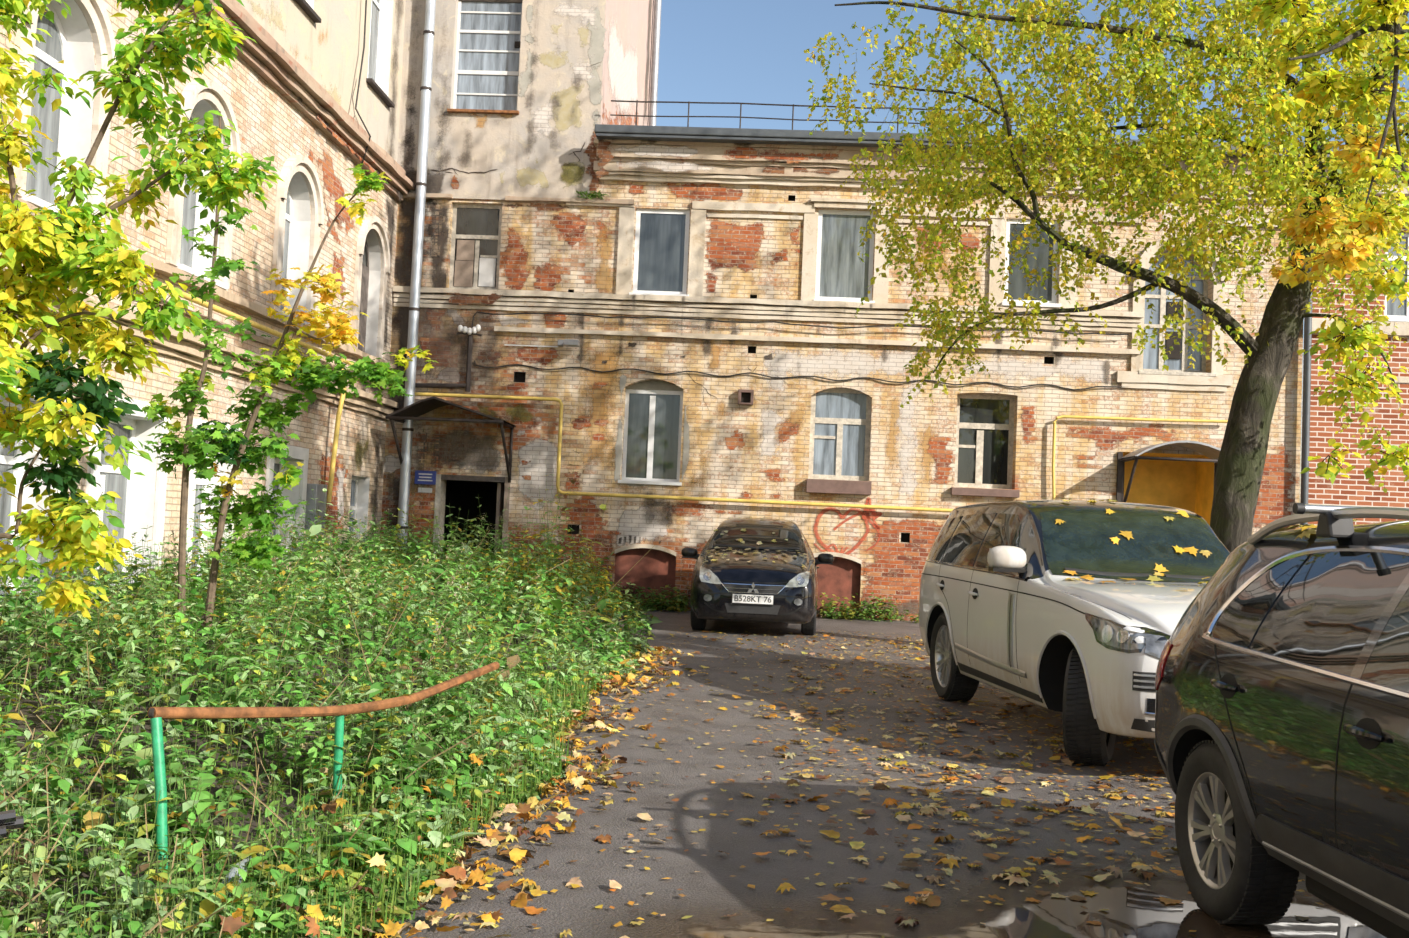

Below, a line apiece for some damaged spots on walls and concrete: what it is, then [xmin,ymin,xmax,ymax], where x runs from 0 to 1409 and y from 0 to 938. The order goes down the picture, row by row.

leakage [527,57,560,148]
peeling [550,84,743,201]
spalling [308,114,377,299]
peeling [507,161,607,247]
peeling [419,227,562,367]
peeling [705,218,804,293]
spalling [517,415,621,586]
peeling [926,436,953,484]
peeling [1021,406,1037,444]
peeling [1066,424,1178,468]
peeling [1253,444,1299,530]
spalling [861,515,949,620]